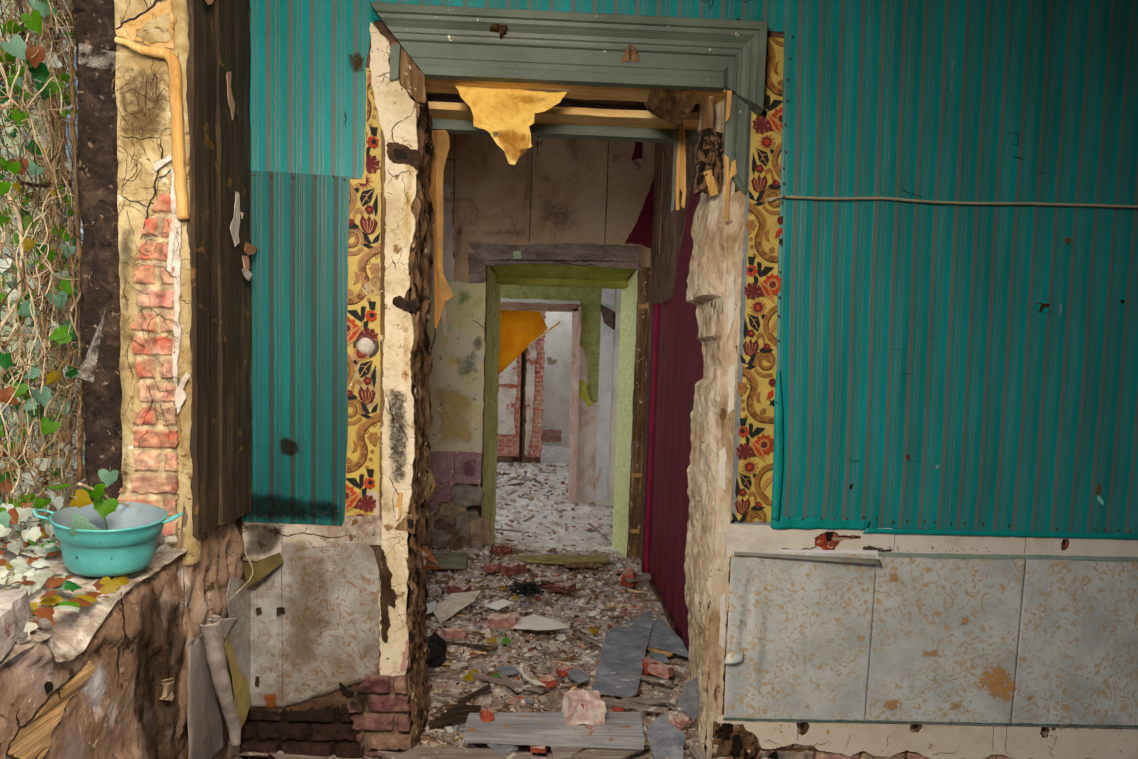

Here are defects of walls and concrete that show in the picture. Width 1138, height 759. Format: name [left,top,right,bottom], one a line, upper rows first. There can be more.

crack [0,660,87,759]
crack [116,591,130,689]
flaking render [239,22,422,759]
peeling [705,191,930,759]